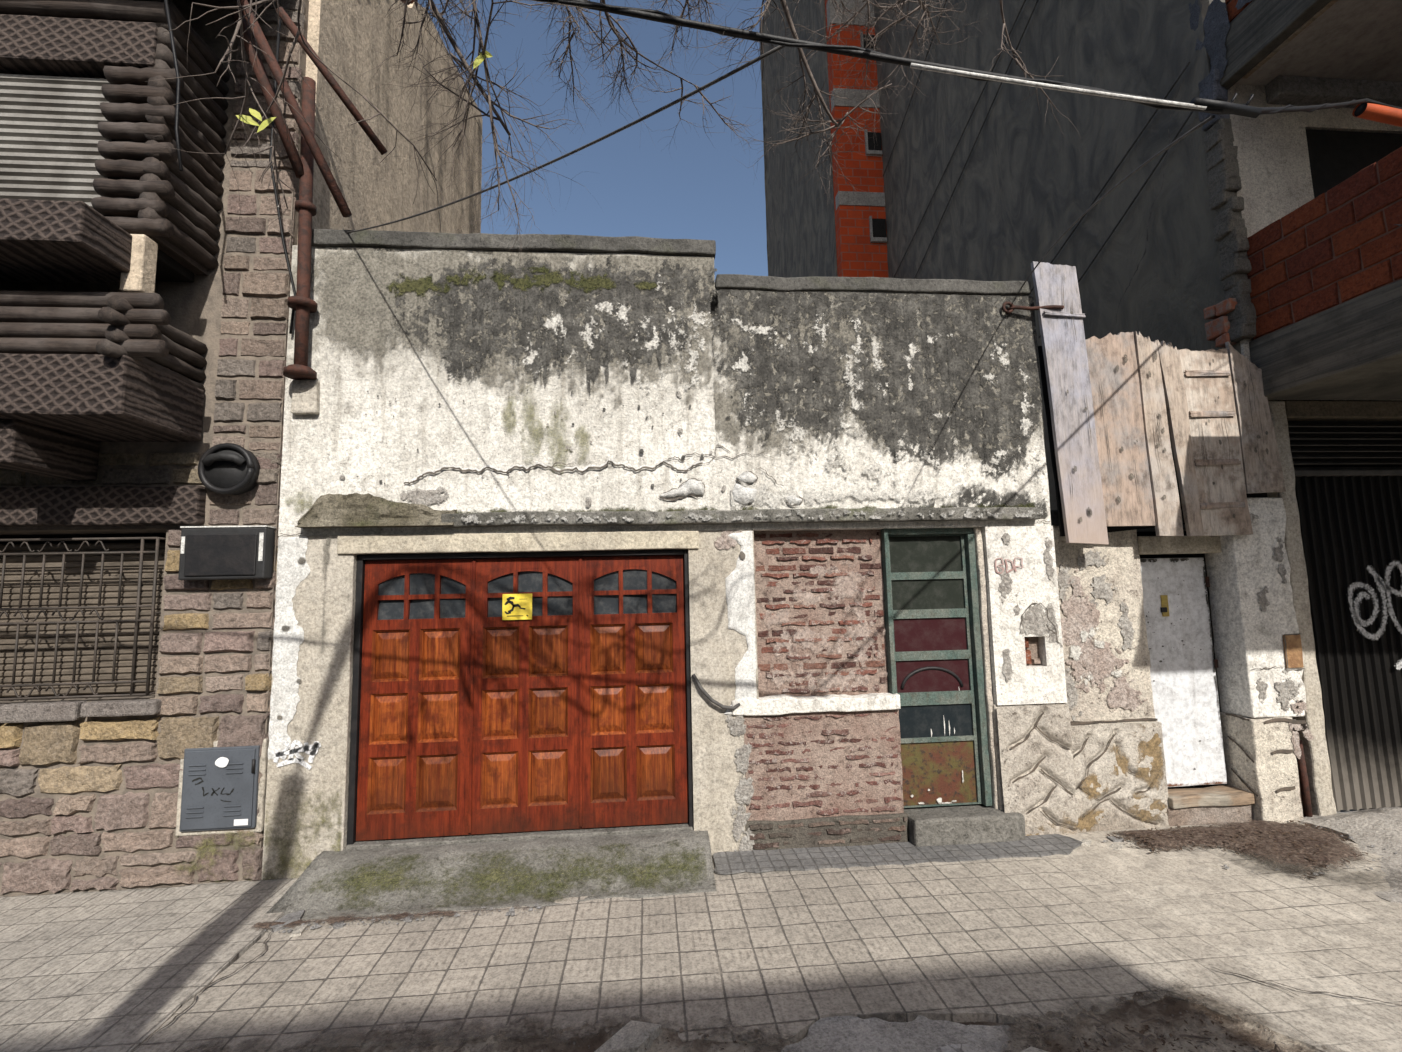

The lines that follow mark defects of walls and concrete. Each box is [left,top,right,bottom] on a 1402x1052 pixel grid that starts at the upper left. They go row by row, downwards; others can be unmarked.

peeling [268,536,310,759]
crack [404,445,783,486]
damp [311,248,1048,518]
peeling [461,313,1164,852]